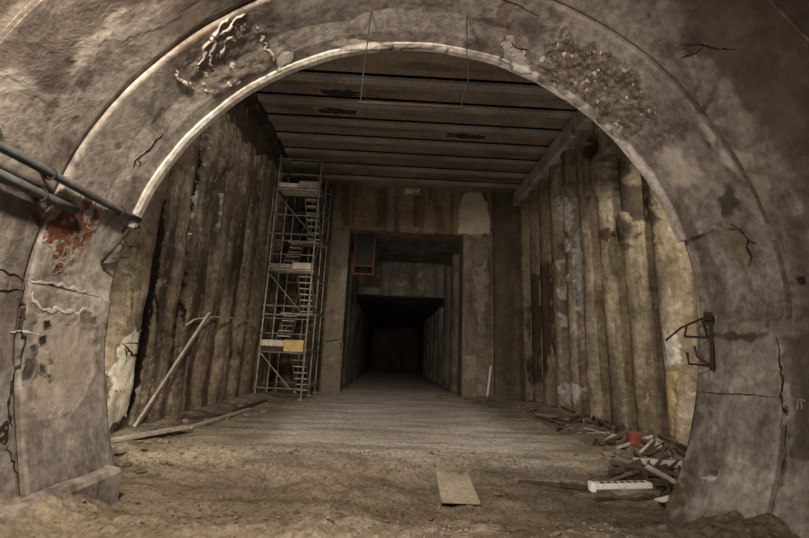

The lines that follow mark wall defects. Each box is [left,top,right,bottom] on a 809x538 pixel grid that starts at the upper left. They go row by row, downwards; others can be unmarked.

spalling [498,29,661,142]
crack [681,43,737,58]
crack [133,133,163,168]
corrosion [30,194,102,275]
crack [727,222,757,267]
crack [0,268,27,428]
crack [696,337,788,488]
crack [7,447,18,477]